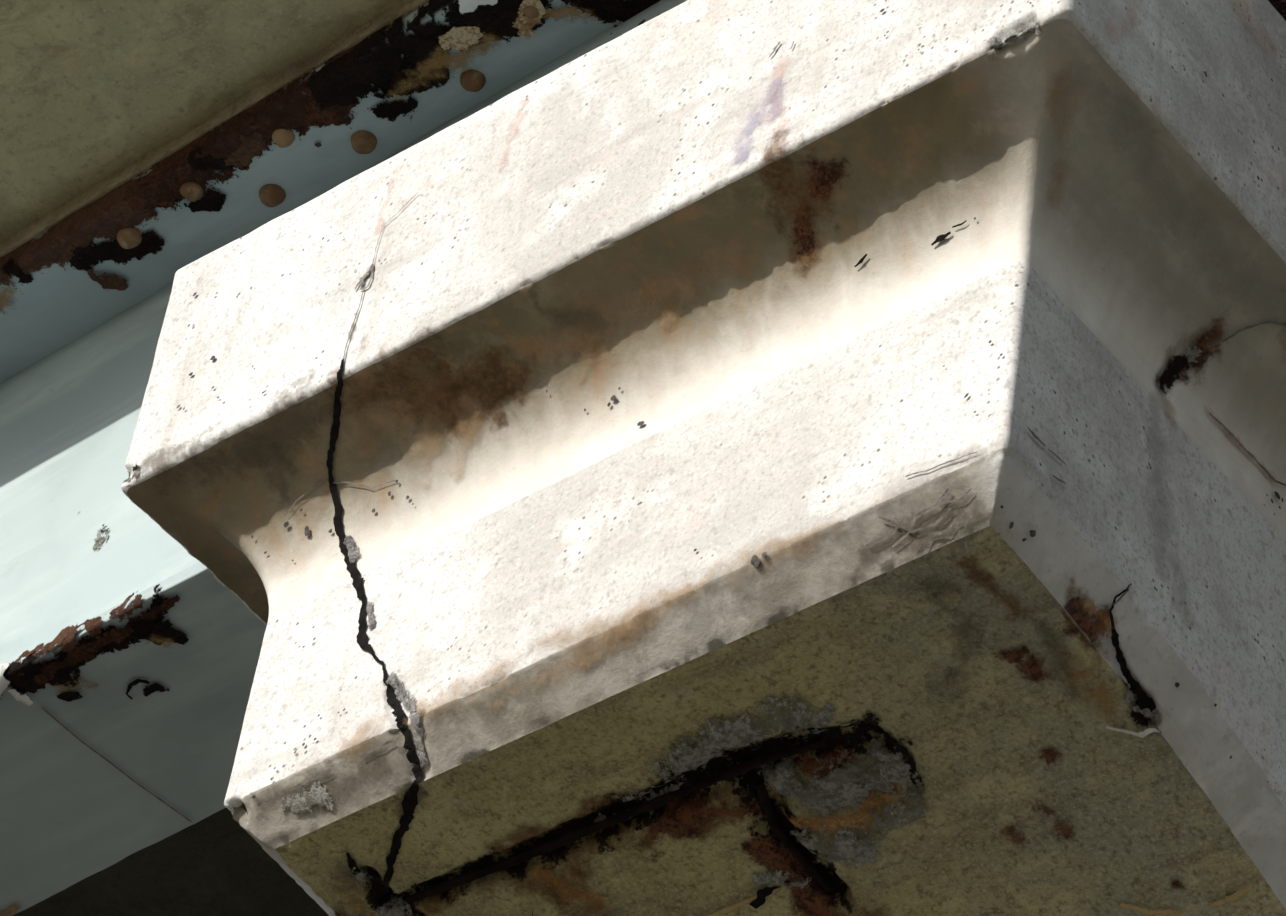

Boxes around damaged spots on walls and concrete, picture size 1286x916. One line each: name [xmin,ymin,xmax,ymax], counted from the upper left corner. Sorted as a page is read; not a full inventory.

rust [0,0,661,313]
rust [762,134,847,269]
rust [0,584,189,706]
crack [285,195,428,889]
water stain [958,559,1020,617]
spalling [346,696,930,916]